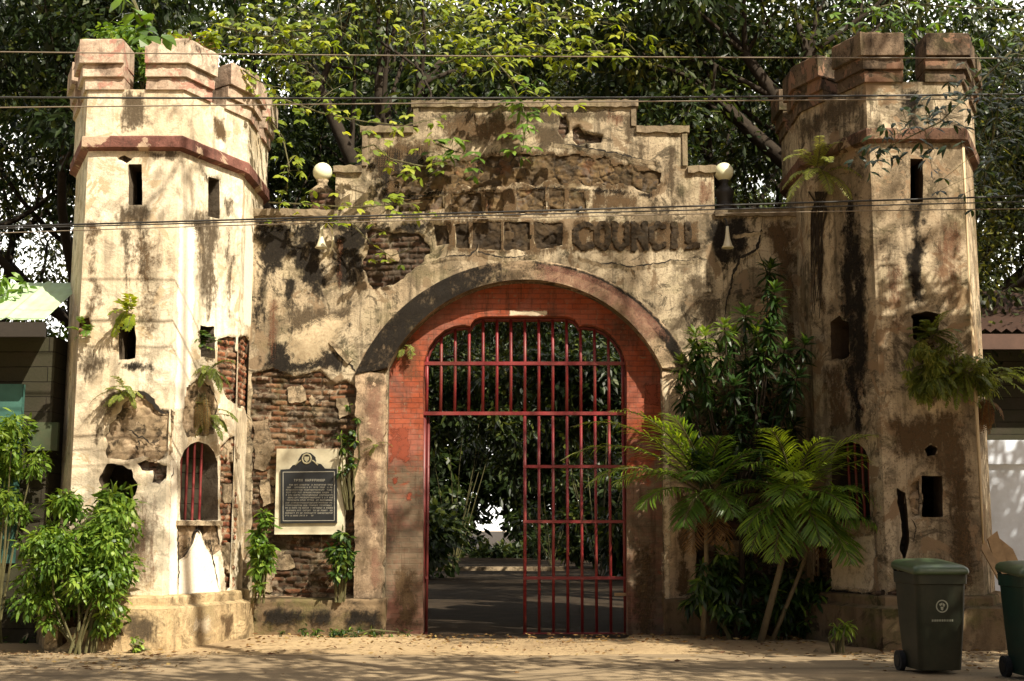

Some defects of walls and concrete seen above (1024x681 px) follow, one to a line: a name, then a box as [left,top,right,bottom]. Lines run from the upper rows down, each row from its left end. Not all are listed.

water stain [121,90,148,131]
water stain [192,210,235,321]
water stain [253,108,750,387]
spalling [363,117,661,289]
water stain [823,194,868,434]
water stain [906,203,926,303]
flaking render [106,222,357,597]